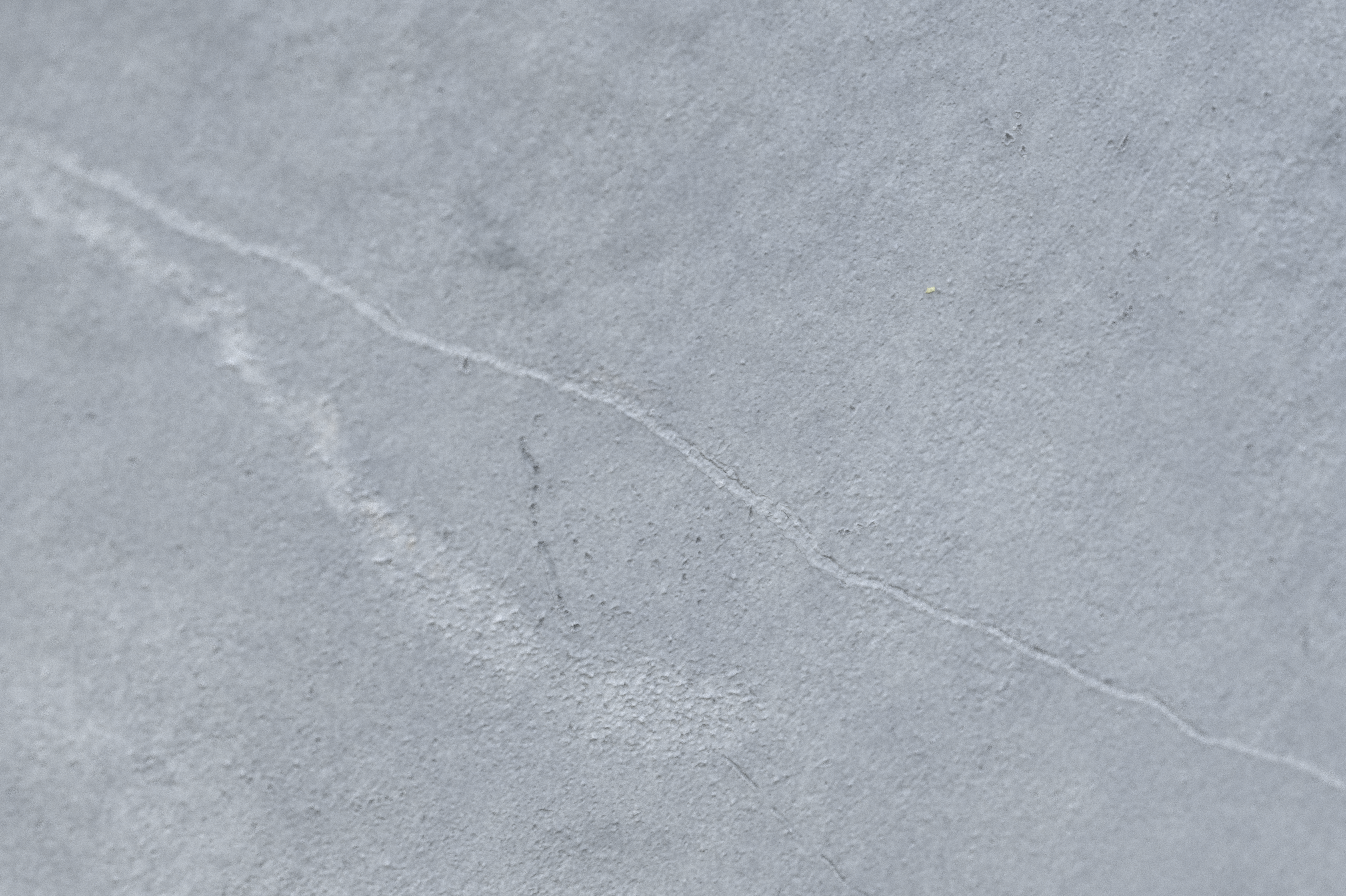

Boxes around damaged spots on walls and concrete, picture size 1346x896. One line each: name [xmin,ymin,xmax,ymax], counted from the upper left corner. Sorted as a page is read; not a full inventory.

crack [0,118,1346,797]